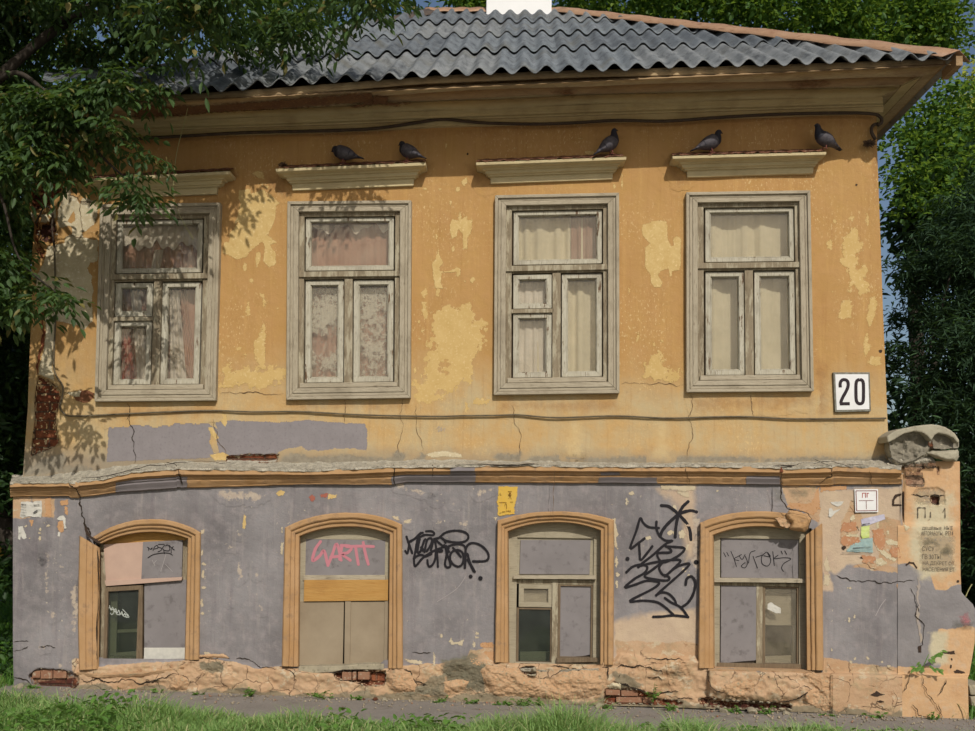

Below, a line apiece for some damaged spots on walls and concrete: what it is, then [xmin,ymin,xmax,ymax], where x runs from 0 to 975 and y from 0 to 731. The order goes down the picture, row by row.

peeling [31,170,99,455]
peeling [223,171,280,283]
peeling [411,234,489,404]
peeling [642,220,681,287]
peeling [826,213,882,366]
crack [393,400,422,484]
crack [69,405,226,655]
crack [837,575,925,649]
crack [82,657,295,685]
spalling [333,669,386,686]
spalling [603,688,683,705]
crack [904,674,946,717]